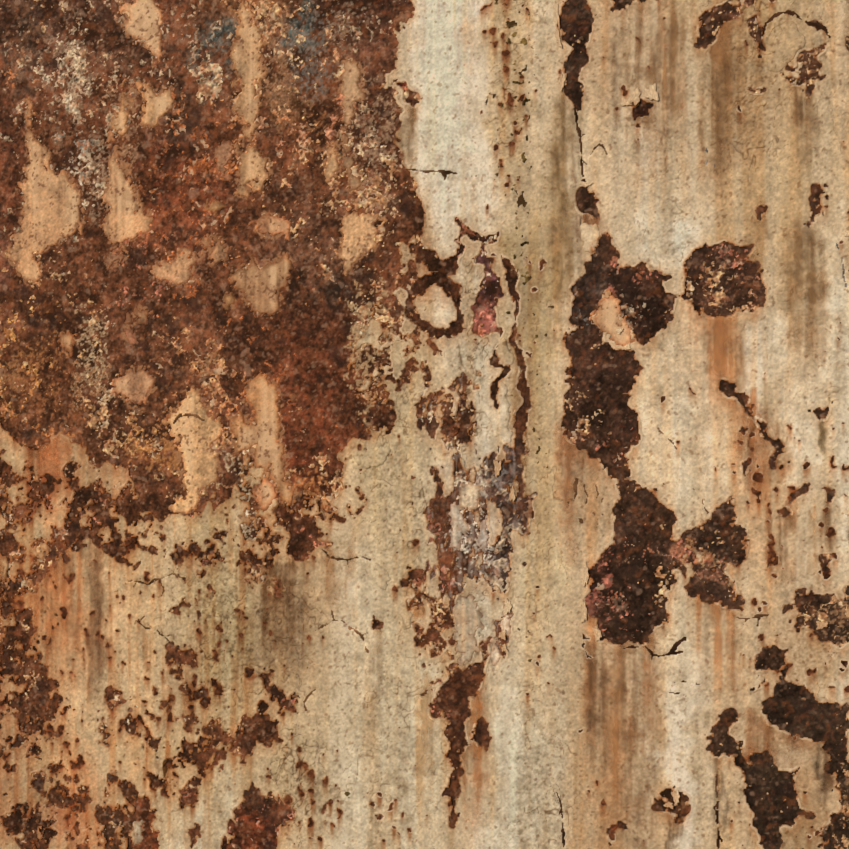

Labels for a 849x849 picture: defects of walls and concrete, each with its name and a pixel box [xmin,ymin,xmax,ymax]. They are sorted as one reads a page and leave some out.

spalling [482,28,510,73]
crack [406,169,477,180]
peeling [589,295,635,347]
rust [0,0,538,849]
spalling [737,428,795,578]
spalling [818,500,837,559]